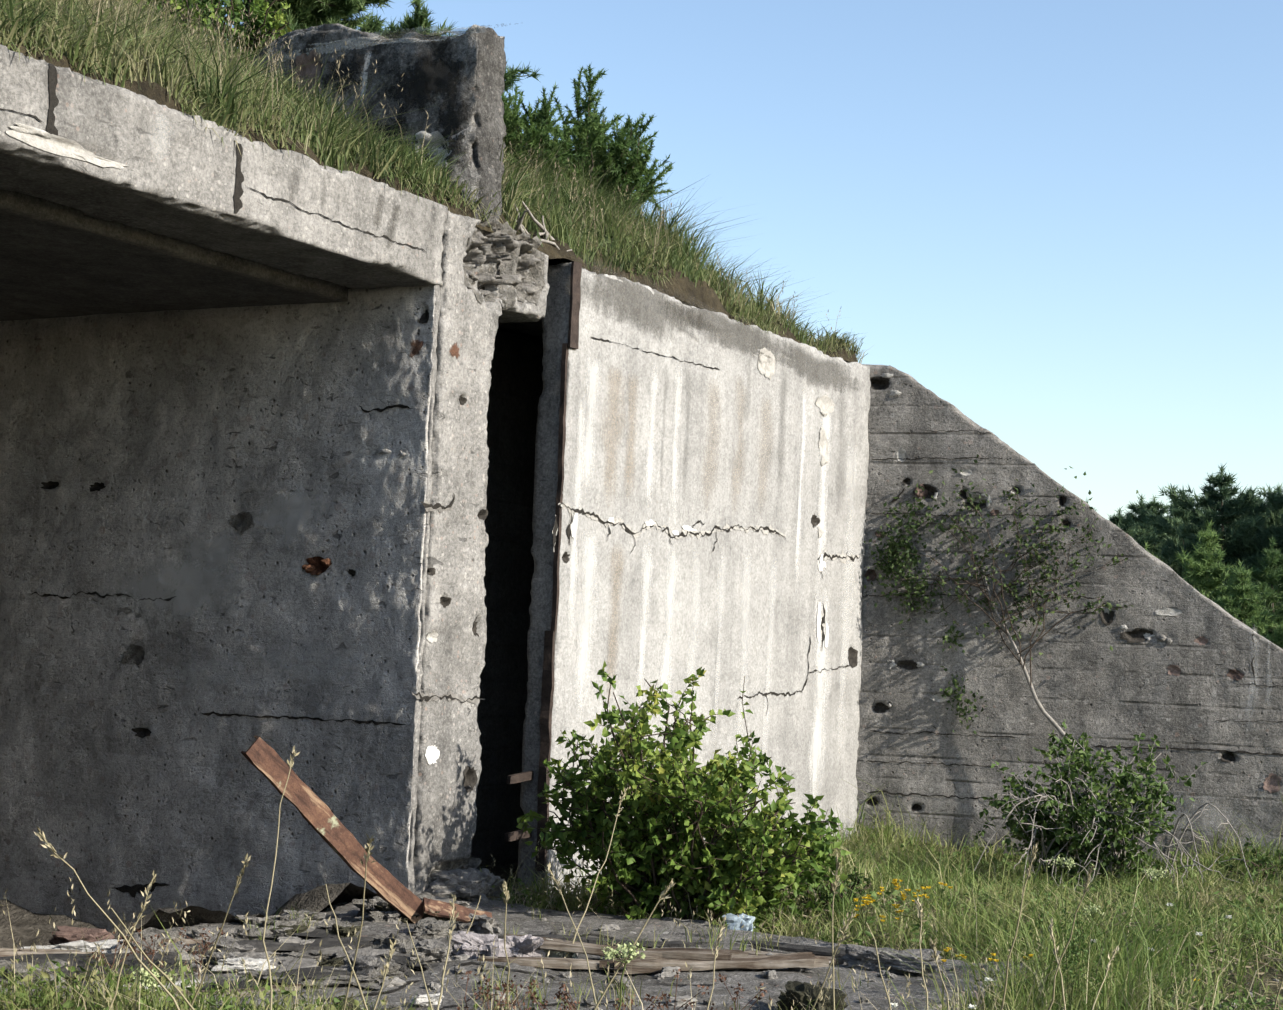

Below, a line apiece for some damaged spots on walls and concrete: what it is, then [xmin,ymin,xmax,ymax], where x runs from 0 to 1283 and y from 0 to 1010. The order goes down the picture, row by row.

crack [0,108,42,122]
crack [250,188,425,251]
spalling [463,215,545,310]
water stain [575,364,599,514]
crack [552,502,786,554]
efflorescence [796,396,806,576]
efflorescence [816,415,830,564]
crack [202,690,485,725]
water stain [569,534,595,702]
water stain [639,554,652,676]
crack [738,550,860,714]
efflorescence [810,600,830,794]